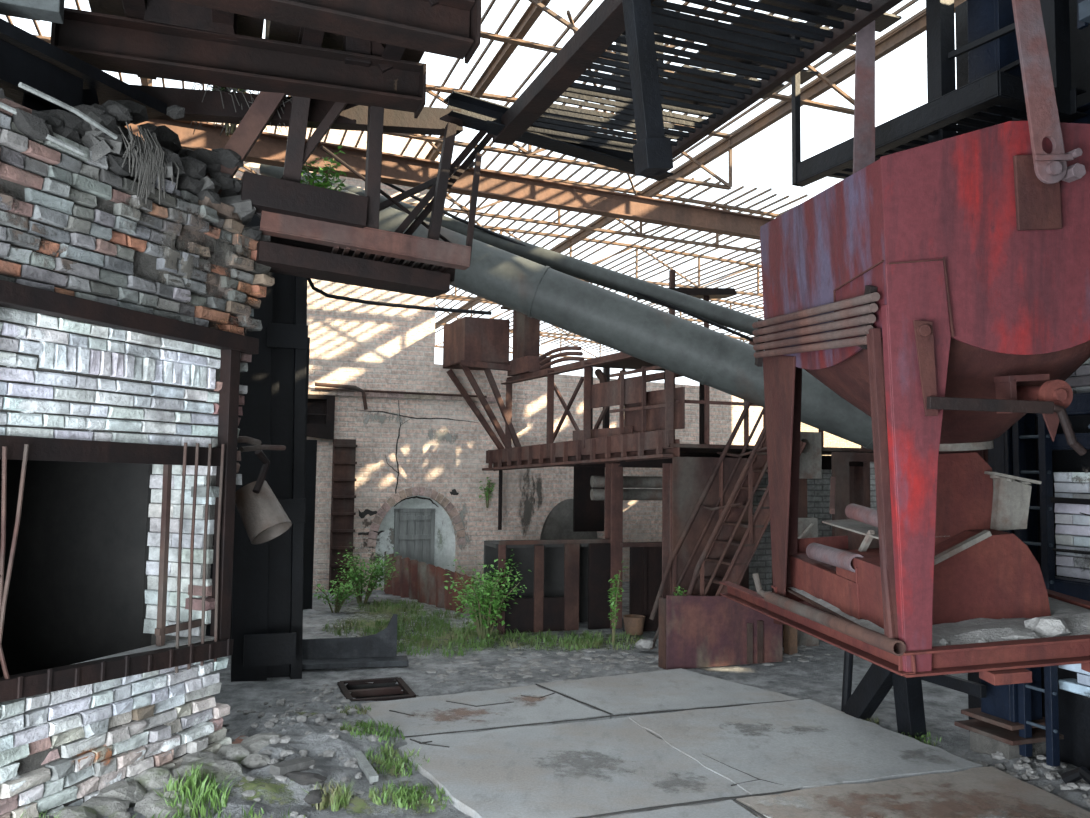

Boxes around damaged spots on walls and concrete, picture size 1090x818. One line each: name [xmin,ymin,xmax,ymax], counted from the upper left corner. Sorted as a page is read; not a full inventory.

crack [360,400,477,507]
leakage [519,470,542,533]